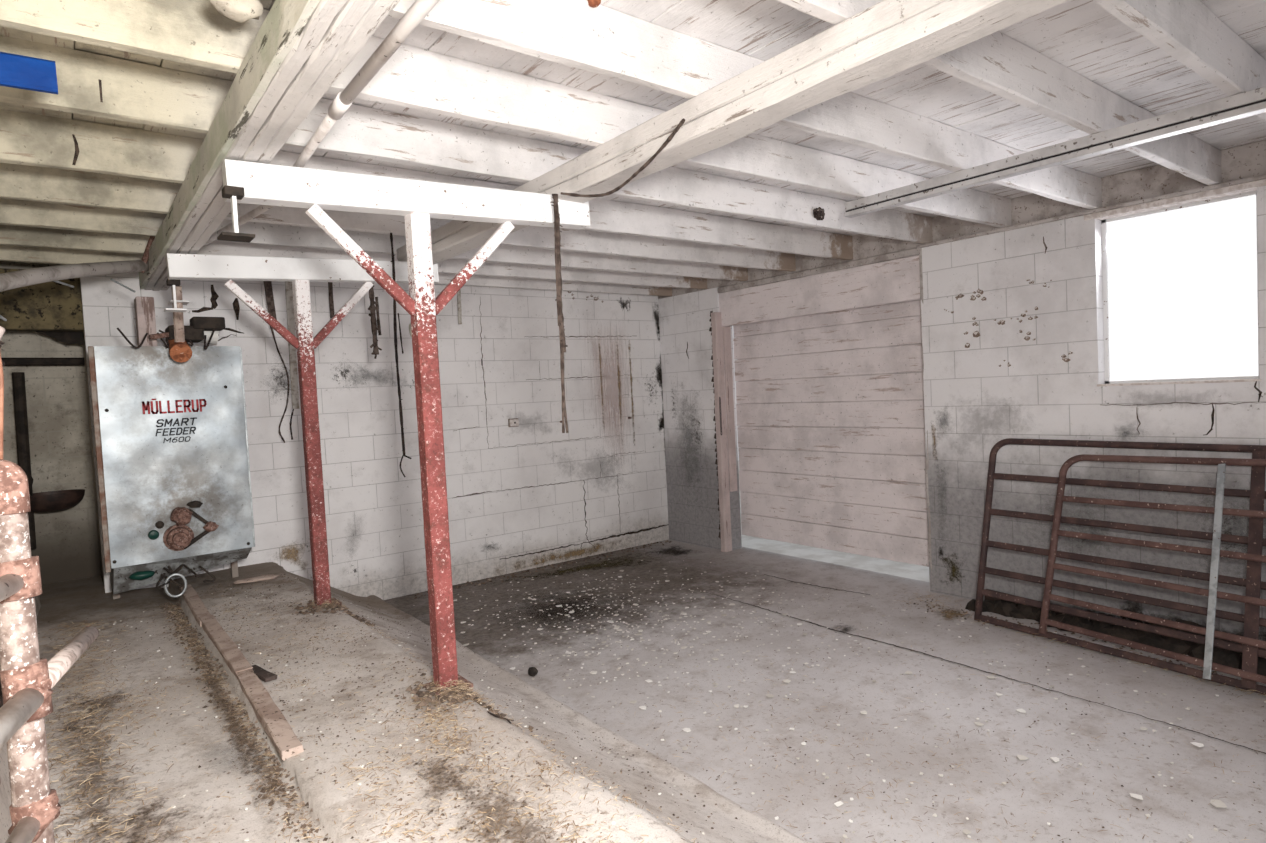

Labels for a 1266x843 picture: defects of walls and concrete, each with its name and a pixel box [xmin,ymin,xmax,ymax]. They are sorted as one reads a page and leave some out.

peeling [944,289,986,313]
peeling [994,306,1038,341]
leakage [333,363,381,388]
crack [454,300,669,560]
leakage [617,347,675,446]
crack [1105,381,1266,435]
crack [706,592,1266,754]
crack [487,711,514,724]